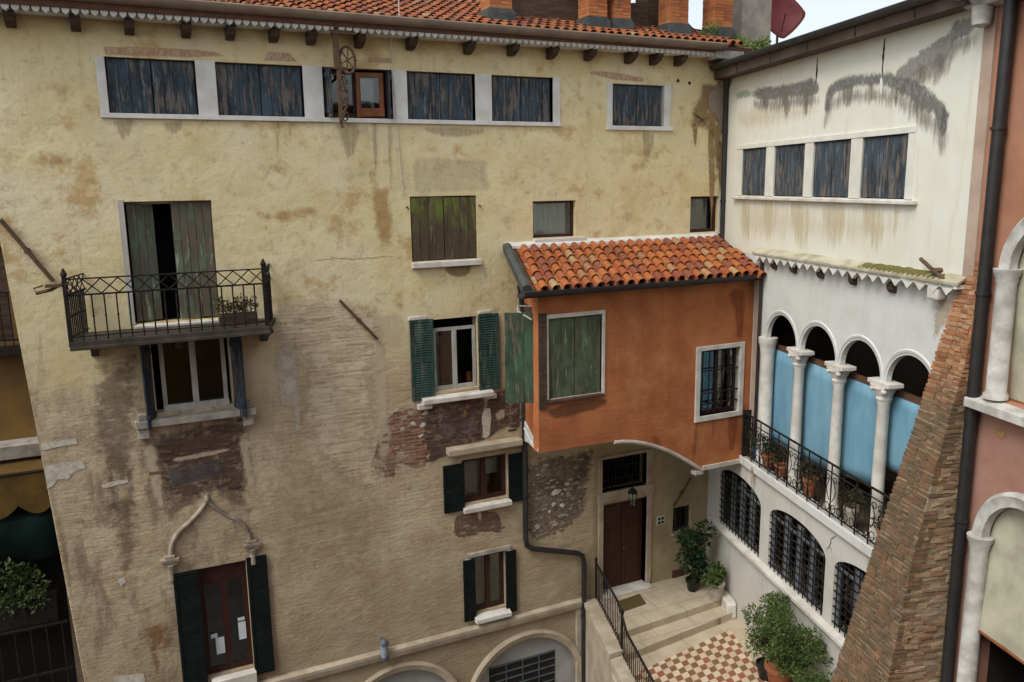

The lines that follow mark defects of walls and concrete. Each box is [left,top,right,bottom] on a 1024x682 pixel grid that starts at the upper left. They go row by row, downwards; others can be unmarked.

water stain [737,18,973,150]
water stain [693,85,722,214]
flaking render [275,299,522,487]
spalling [149,418,252,502]
spalling [449,508,505,543]